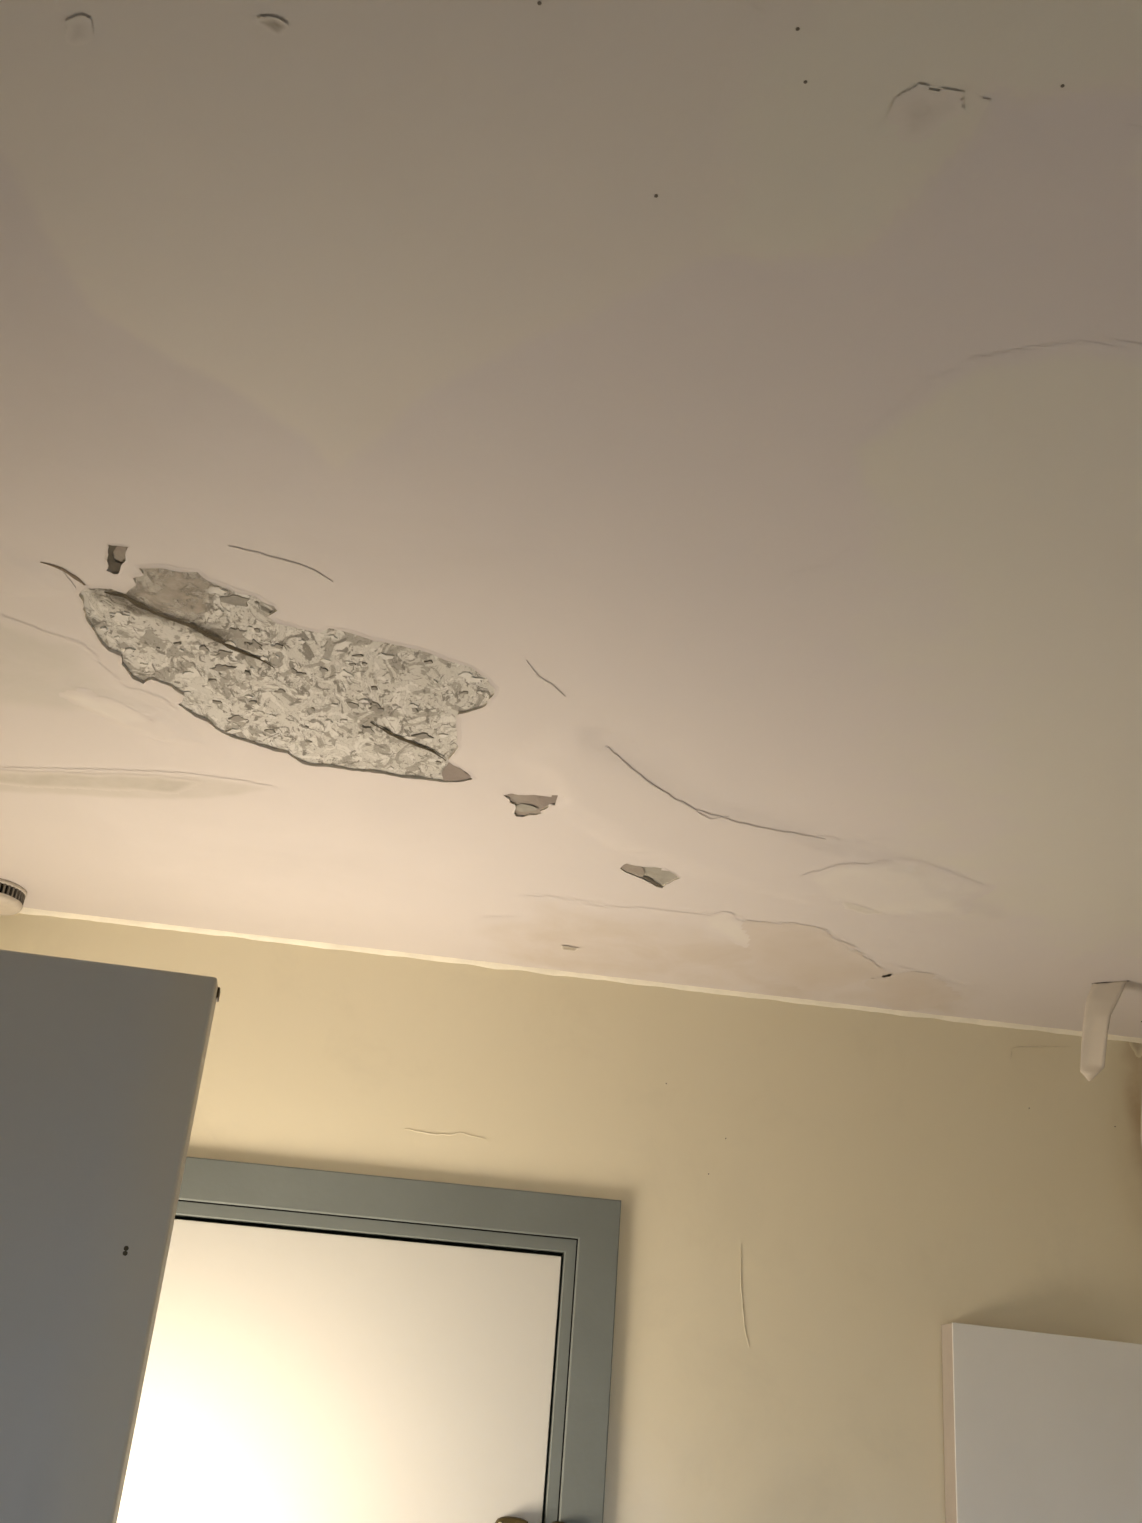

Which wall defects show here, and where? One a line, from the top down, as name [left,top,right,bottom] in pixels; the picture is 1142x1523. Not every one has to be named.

crack [40,562,85,588]
peeling [74,543,500,784]
peeling [502,793,564,818]
peeling [619,863,681,888]
peeling [1080,981,1127,1081]